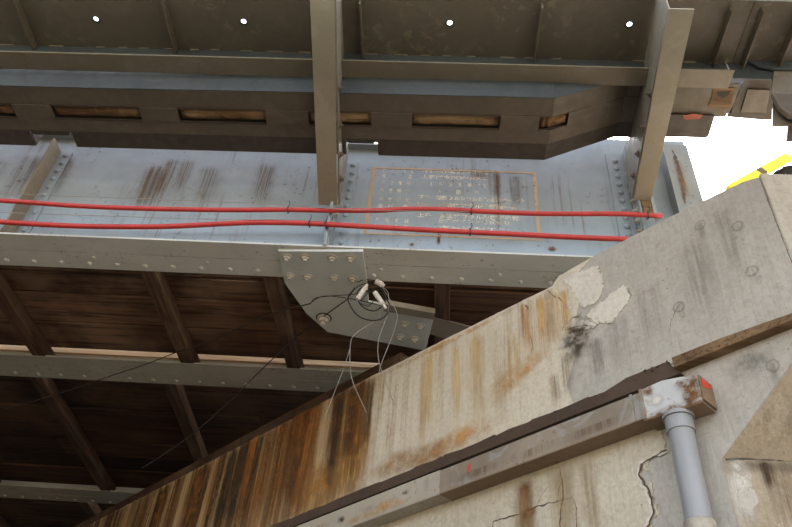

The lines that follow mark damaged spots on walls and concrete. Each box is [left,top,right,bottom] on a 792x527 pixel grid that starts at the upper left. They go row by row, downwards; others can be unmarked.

corrosion [672,150,686,204]
crack [548,290,588,331]
peeling [553,266,632,353]
corrosion [679,378,698,405]
crack [725,455,782,463]
crack [492,467,577,527]